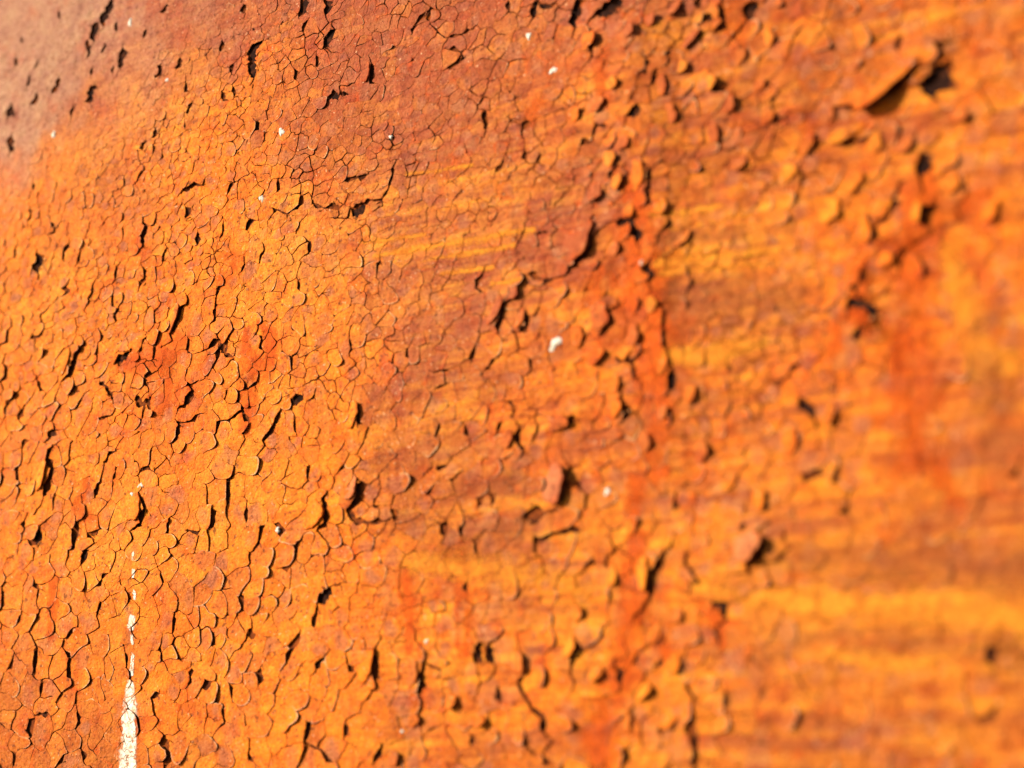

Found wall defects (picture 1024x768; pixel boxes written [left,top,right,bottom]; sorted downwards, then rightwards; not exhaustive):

spalling [87,0,132,56]
spalling [247,42,262,78]
crack [184,0,1024,287]
peeling [525,159,691,268]
peeling [64,242,265,420]
peeling [183,478,231,535]
rust [240,324,276,433]
peeling [242,454,381,569]
crack [0,79,731,768]
rust [585,181,674,768]
crack [362,186,1024,768]
peeling [0,523,110,768]